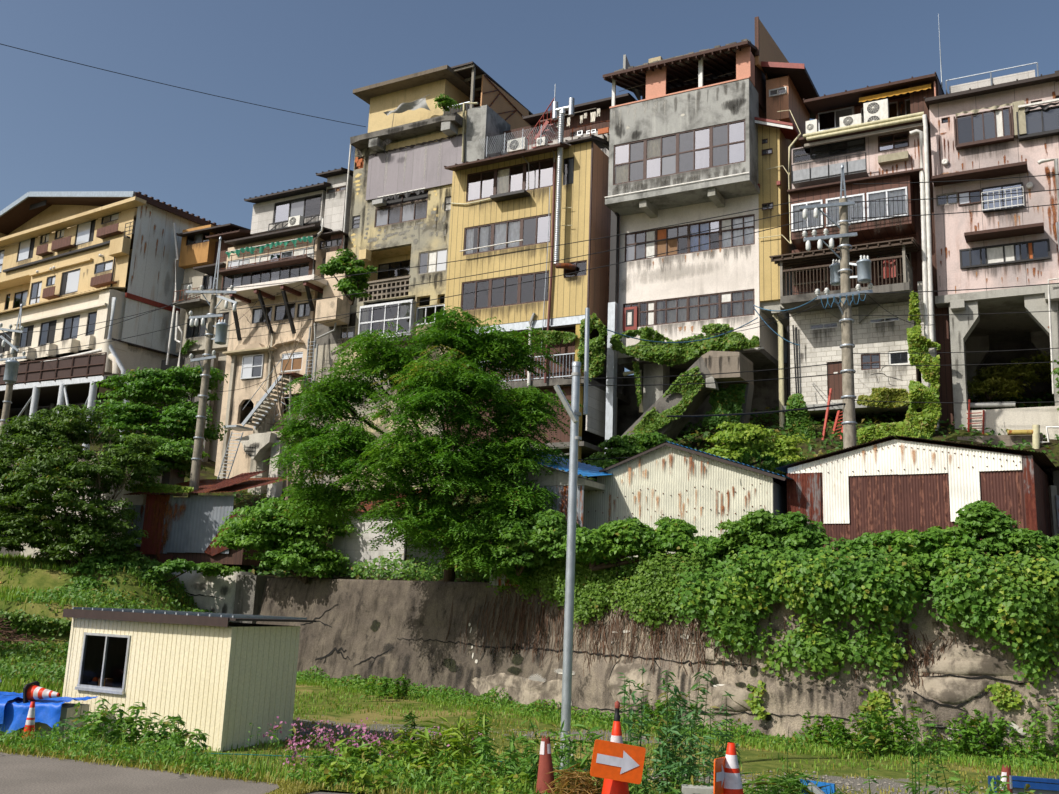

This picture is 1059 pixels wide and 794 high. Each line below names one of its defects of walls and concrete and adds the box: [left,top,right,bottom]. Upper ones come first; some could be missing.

leakage [615,122,640,139]
leakage [725,99,743,114]
corrosion [938,118,973,174]
corrosion [1028,167,1059,264]
corrosion [621,454,709,516]
corrosion [716,487,756,531]
leakage [456,650,495,685]
crack [300,604,756,678]
crack [557,704,854,721]
crack [913,674,1038,739]